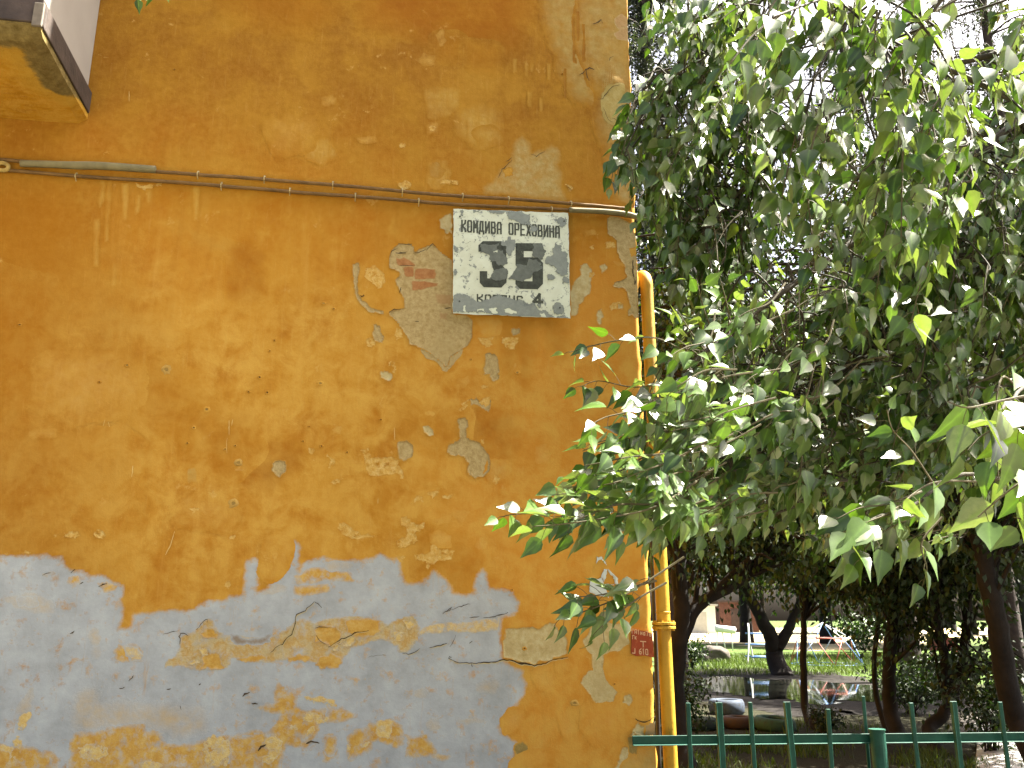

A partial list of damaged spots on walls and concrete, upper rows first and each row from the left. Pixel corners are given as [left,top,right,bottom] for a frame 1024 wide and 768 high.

flaking render [423,85,573,202]
peeling [537,0,639,326]
flaking render [352,243,521,485]
peeling [301,440,414,485]
peeling [256,530,355,597]
peeling [396,491,470,570]
crack [273,602,369,652]
flaking render [164,616,571,694]
crack [402,640,567,667]
peeling [0,682,452,768]
peeling [499,706,526,736]
peeling [508,622,656,768]